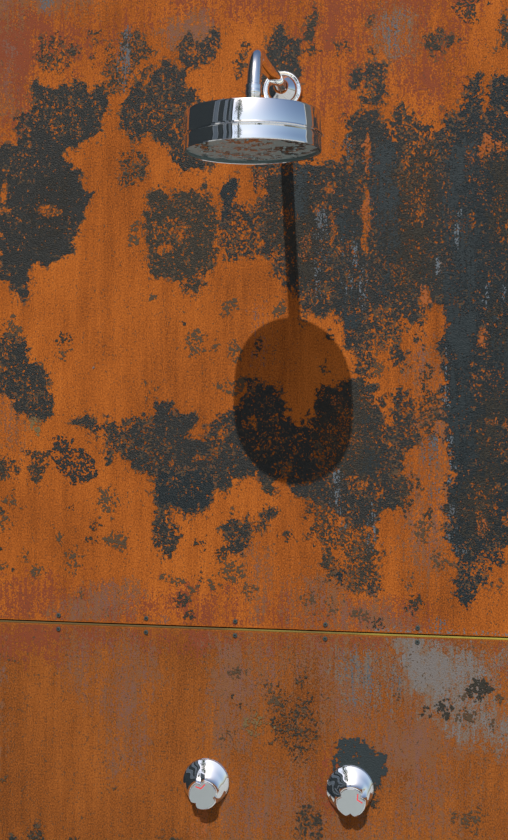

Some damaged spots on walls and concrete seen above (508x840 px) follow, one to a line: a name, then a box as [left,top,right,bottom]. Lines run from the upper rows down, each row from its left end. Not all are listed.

rust [361,136,373,172]
rust [465,133,508,160]
rust [360,193,374,236]
rust [420,284,433,307]